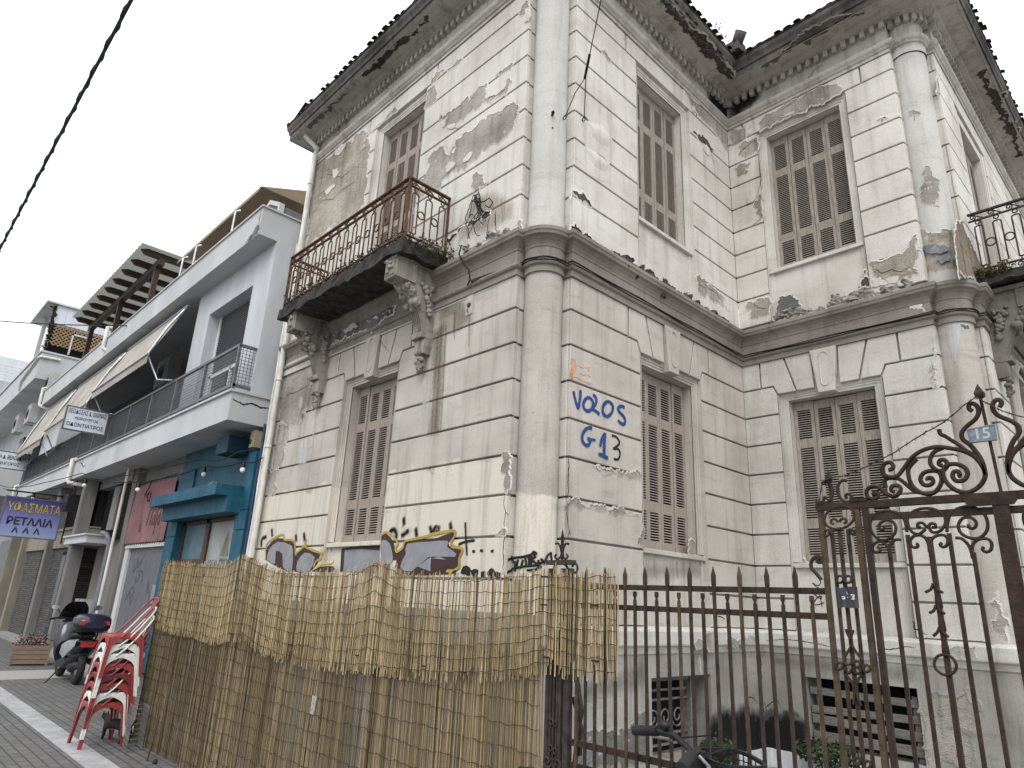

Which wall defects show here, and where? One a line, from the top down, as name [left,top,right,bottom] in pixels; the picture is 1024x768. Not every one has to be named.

flaking render [307,107,399,246]
flaking render [417,57,520,200]
flaking render [660,43,844,224]
flaking render [919,165,941,207]
spalling [974,66,1024,158]
flaking render [744,219,981,324]
spalling [987,589,1012,644]